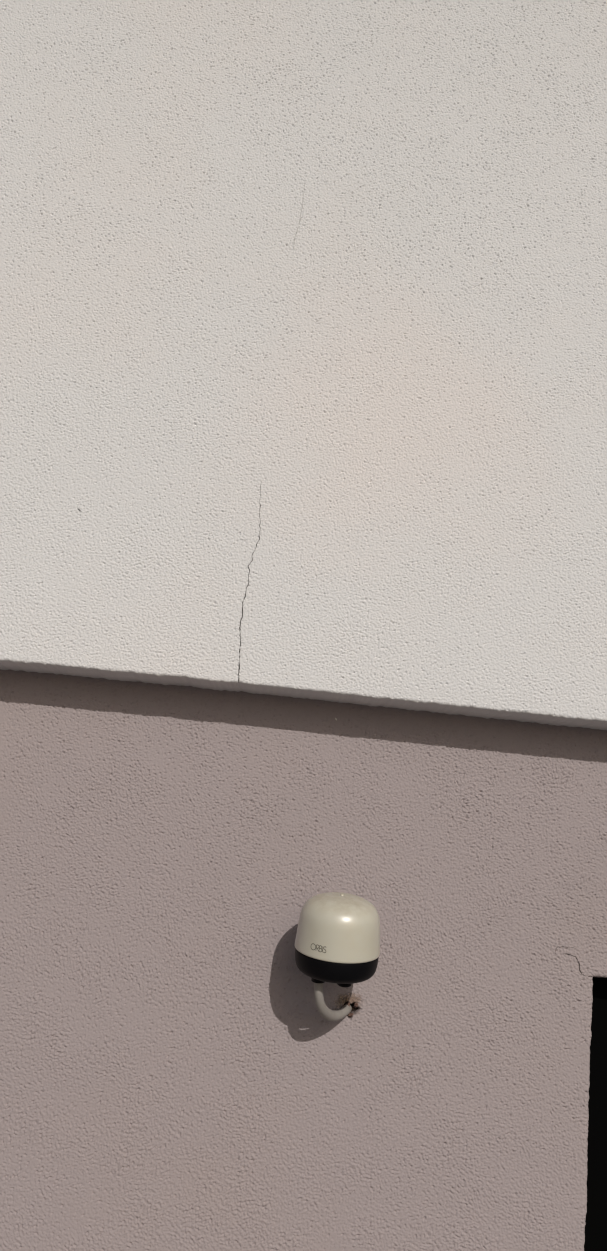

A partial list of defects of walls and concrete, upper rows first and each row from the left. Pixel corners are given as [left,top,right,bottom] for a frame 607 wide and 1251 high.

crack [238,481,262,682]